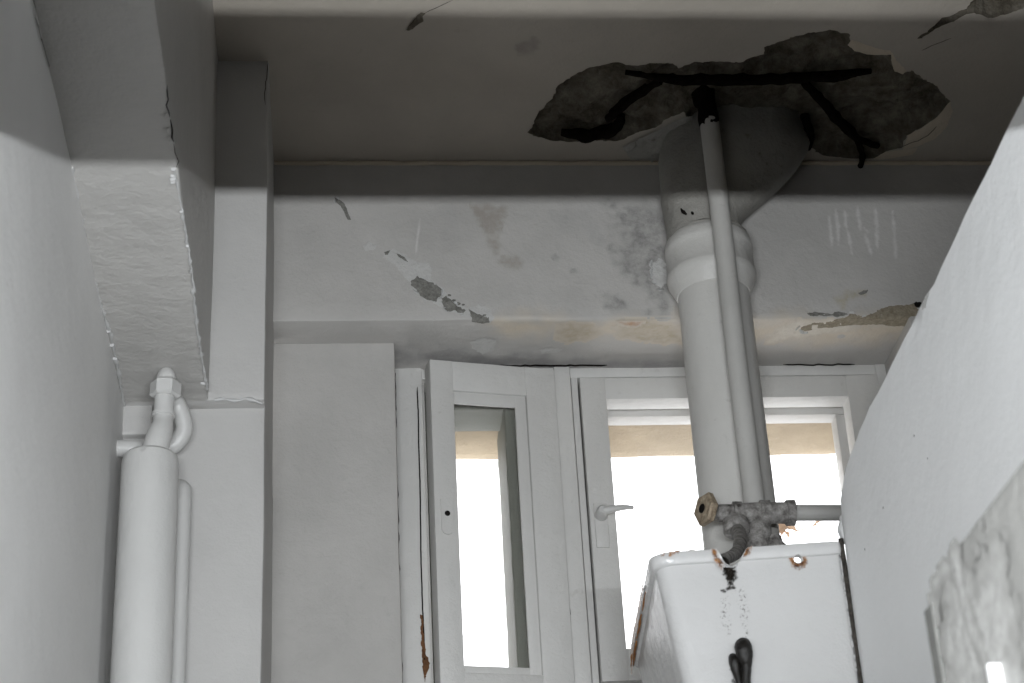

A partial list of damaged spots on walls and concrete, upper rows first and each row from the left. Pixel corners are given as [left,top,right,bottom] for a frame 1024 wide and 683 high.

peeling [407,1,450,31]
spalling [917,0,1024,50]
crack [164,86,179,167]
spalling [527,30,953,169]
flaking render [383,248,495,324]
leakage [394,193,685,370]
leakage [752,301,904,354]
flaking render [763,300,922,345]